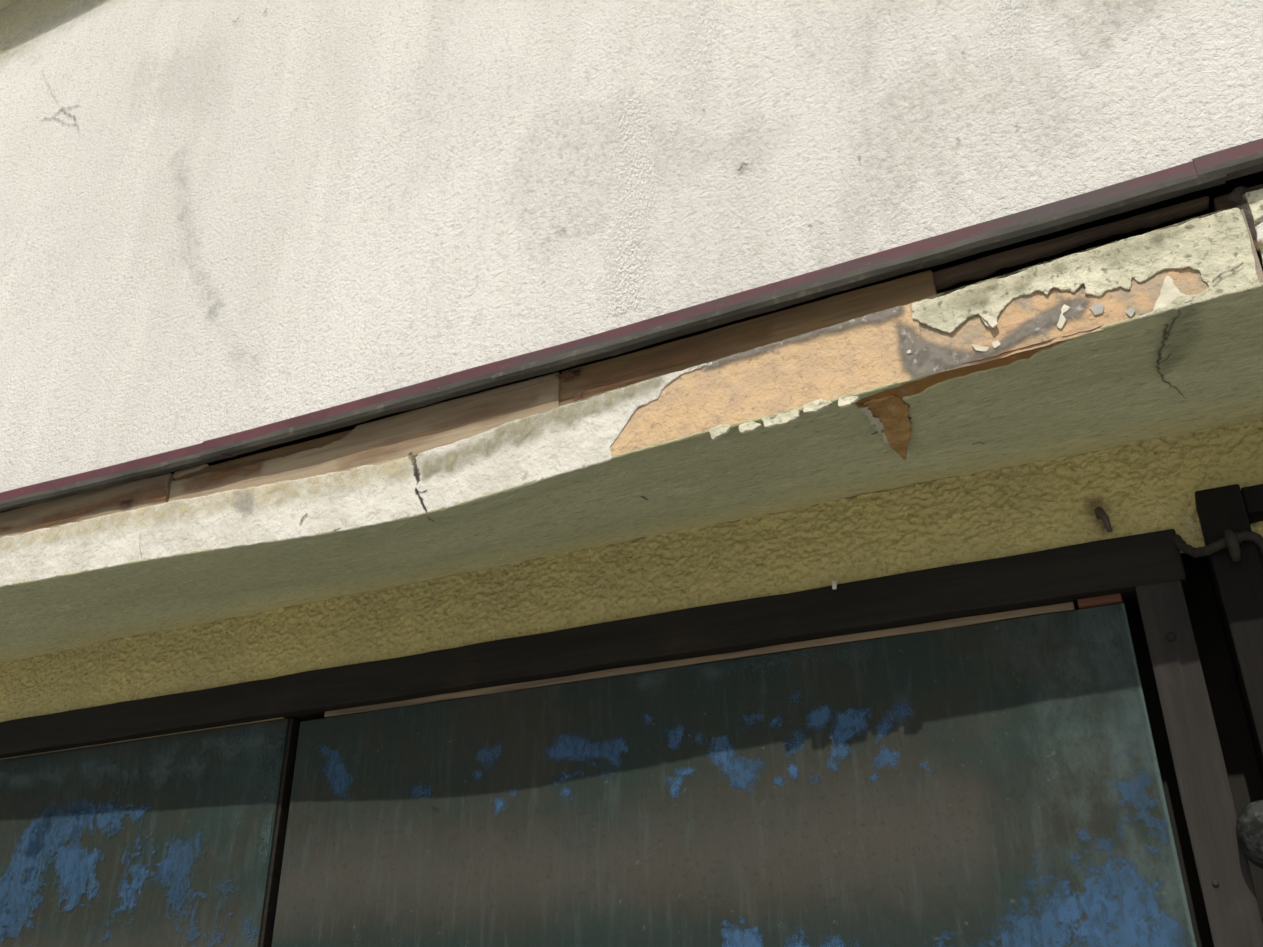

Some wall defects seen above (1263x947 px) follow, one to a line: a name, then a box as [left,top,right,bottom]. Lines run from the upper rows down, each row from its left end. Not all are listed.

crack [1229,186,1263,248]
spalling [610,208,1263,460]
crack [1157,310,1182,394]
crack [408,452,435,522]